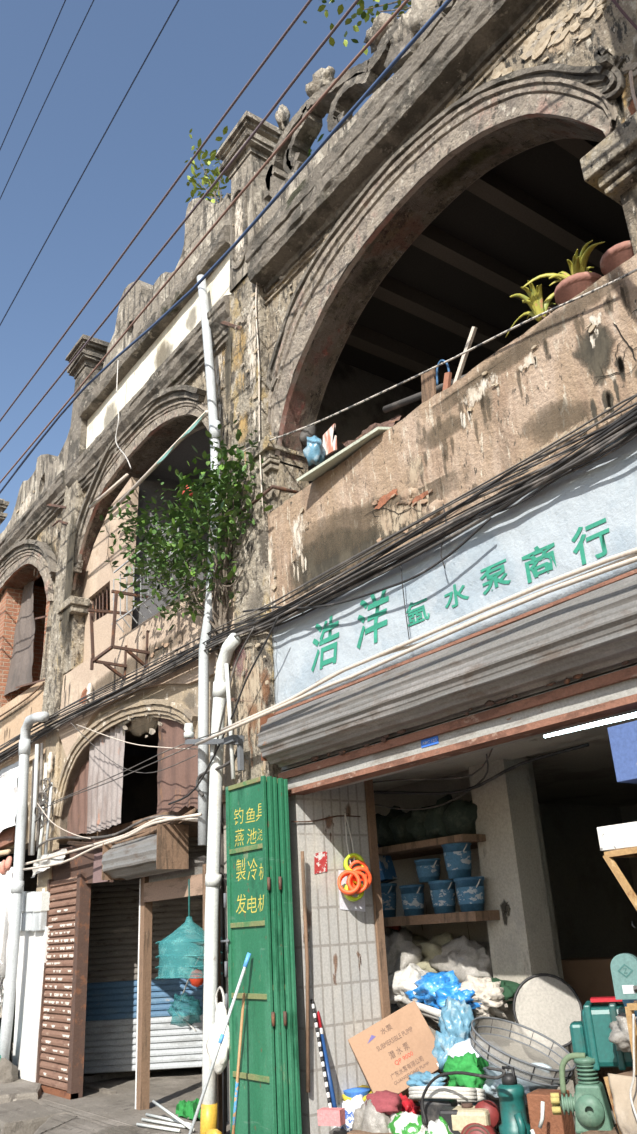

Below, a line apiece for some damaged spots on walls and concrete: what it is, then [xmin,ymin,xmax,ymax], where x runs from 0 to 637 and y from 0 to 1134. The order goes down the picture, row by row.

peeling [491,0,606,79]
peeling [214,293,269,465]
peeling [460,371,500,428]
water stain [290,286,637,607]
peeling [372,456,433,542]
peeling [291,507,308,581]